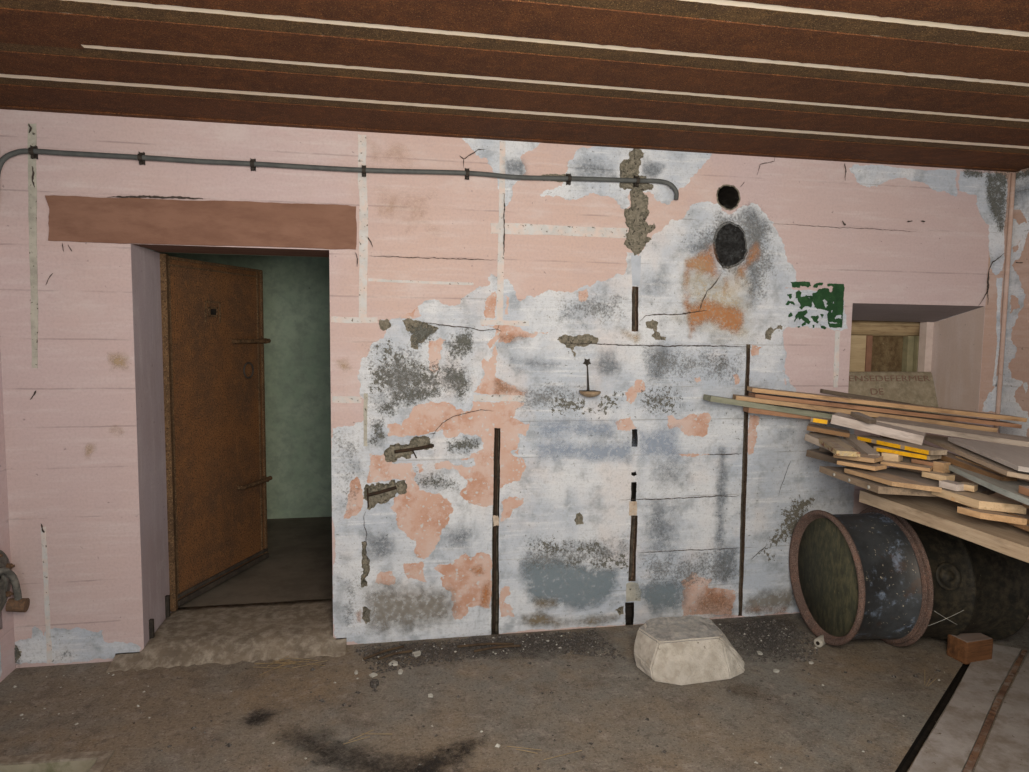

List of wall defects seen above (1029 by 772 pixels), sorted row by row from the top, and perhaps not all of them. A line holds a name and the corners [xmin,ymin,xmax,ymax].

crack [643,276,720,318]
peeling [849,164,1029,437]
crack [979,254,1023,305]
crack [569,341,742,349]
water stain [370,323,474,446]
peeling [331,138,855,644]
water stain [368,591,450,630]